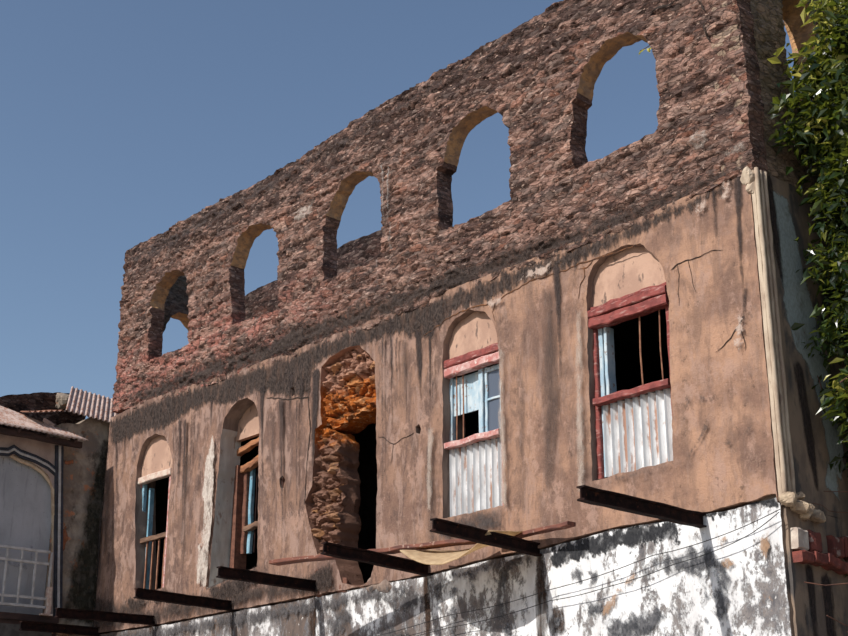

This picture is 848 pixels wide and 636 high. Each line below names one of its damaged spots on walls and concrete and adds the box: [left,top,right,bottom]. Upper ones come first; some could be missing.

crack [671,250,716,297]
spalling [322,346,376,434]
leakage [66,160,746,636]
leakage [750,498,778,508]